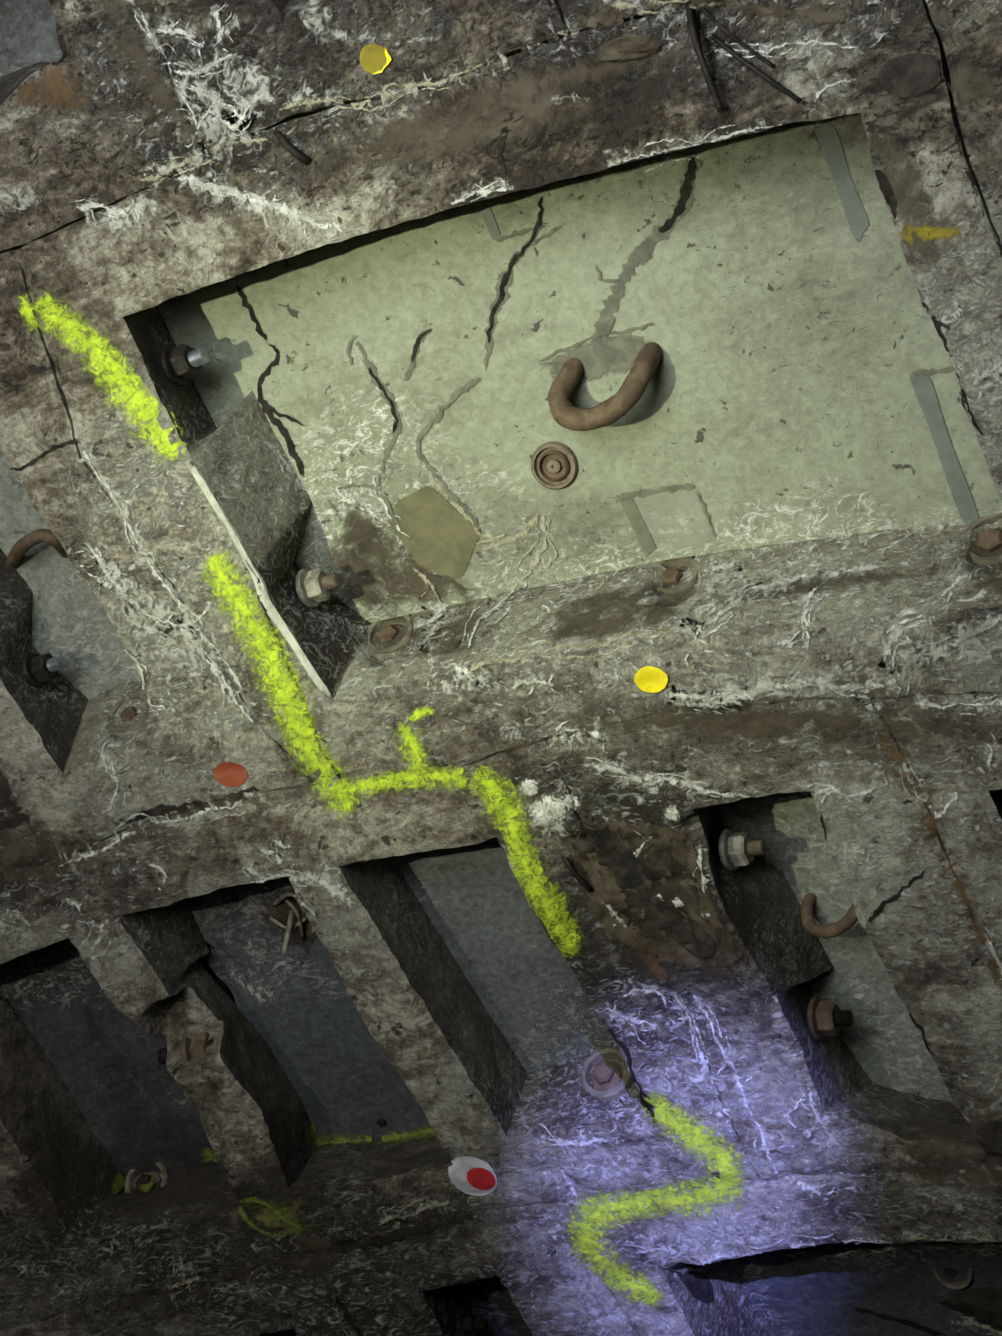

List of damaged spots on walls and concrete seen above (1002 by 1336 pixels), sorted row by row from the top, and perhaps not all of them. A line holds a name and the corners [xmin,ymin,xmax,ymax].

efflorescence [613,0,719,23]
damp [69,0,682,239]
damp [609,121,782,173]
crack [591,153,701,346]
crack [10,439,80,471]
crack [236,285,304,475]
crack [337,196,562,528]
crack [919,292,983,435]
damp [75,450,253,722]
damp [0,740,260,940]
rust [880,734,1002,986]
spalling [939,1287,1002,1336]